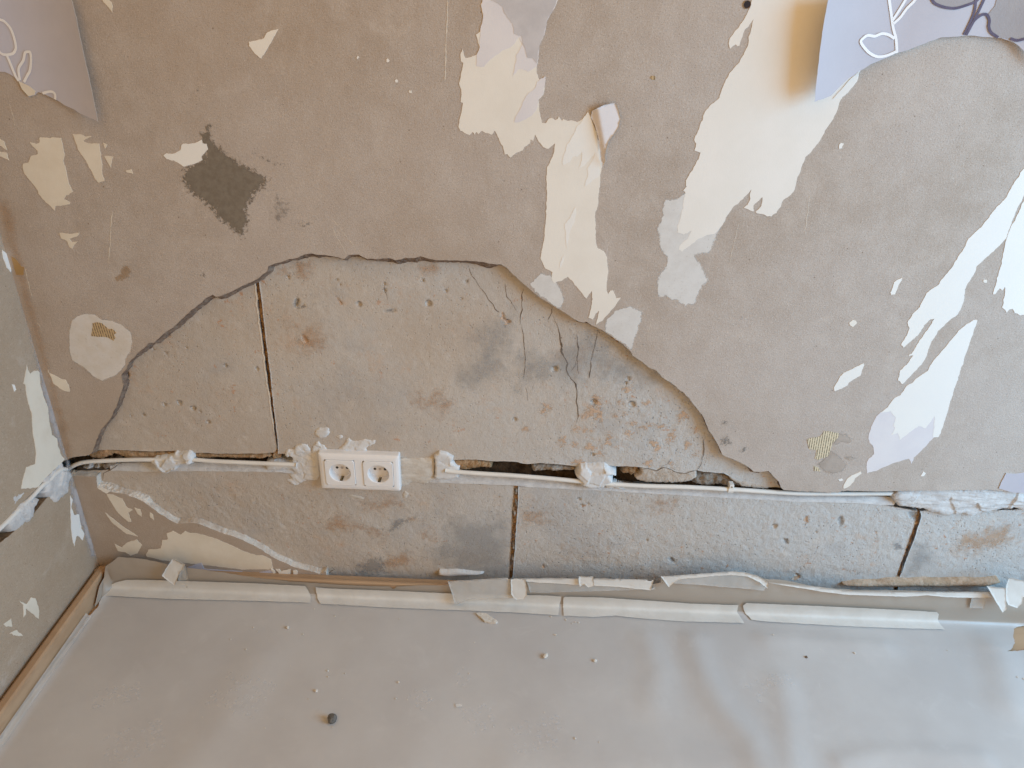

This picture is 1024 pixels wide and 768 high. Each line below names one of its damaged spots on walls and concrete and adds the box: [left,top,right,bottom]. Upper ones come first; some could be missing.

water stain [182,125,266,235]
crack [468,265,528,400]
flaking render [75,253,1024,592]
crack [548,307,598,423]